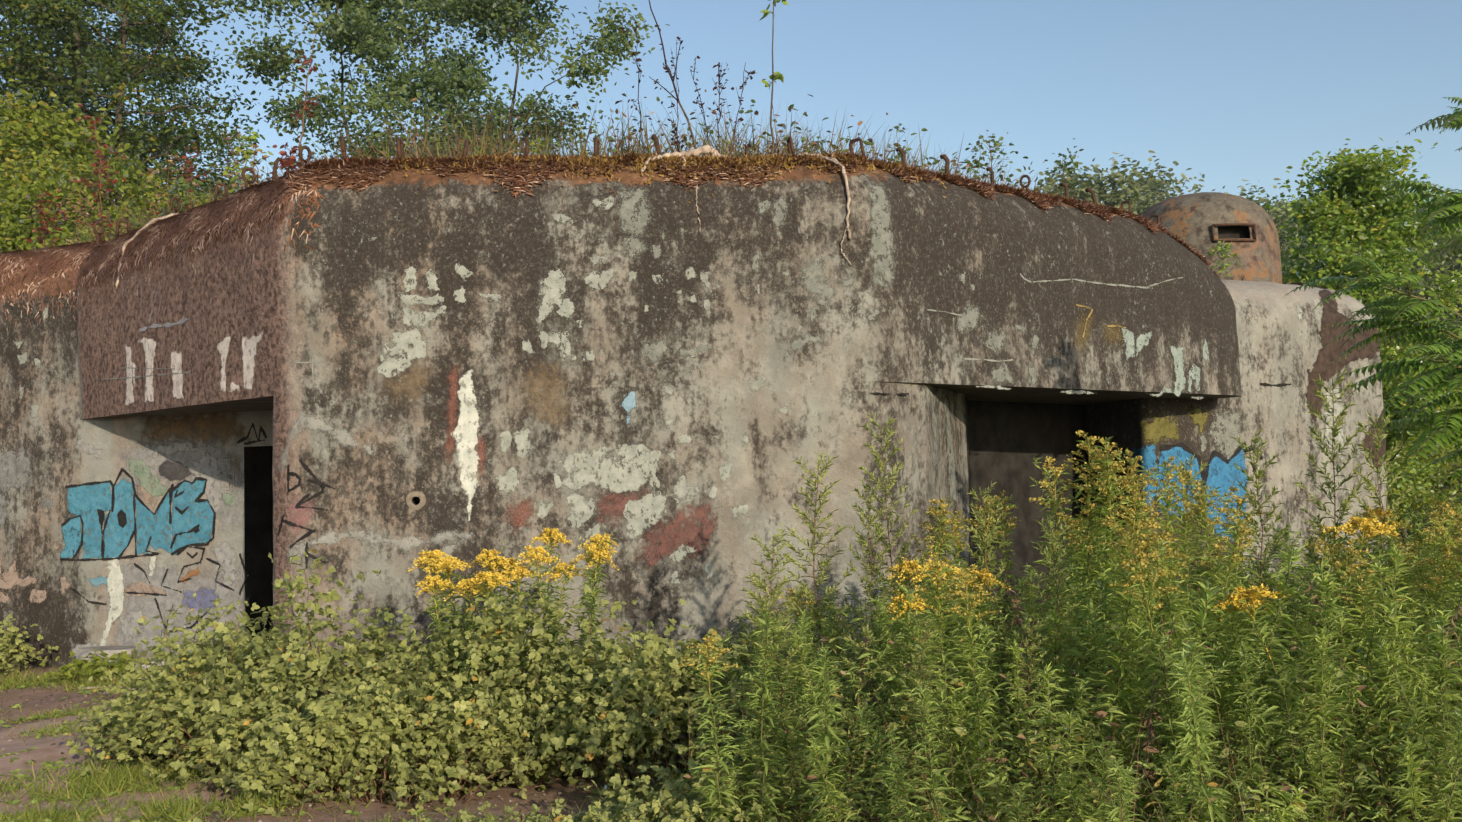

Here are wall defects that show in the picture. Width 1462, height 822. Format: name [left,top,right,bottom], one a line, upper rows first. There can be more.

peeling [376,263,502,378]
peeling [522,187,720,361]
leakage [867,182,895,288]
crack [1020,273,1183,338]
leakage [1160,340,1209,397]
peeling [537,419,749,544]